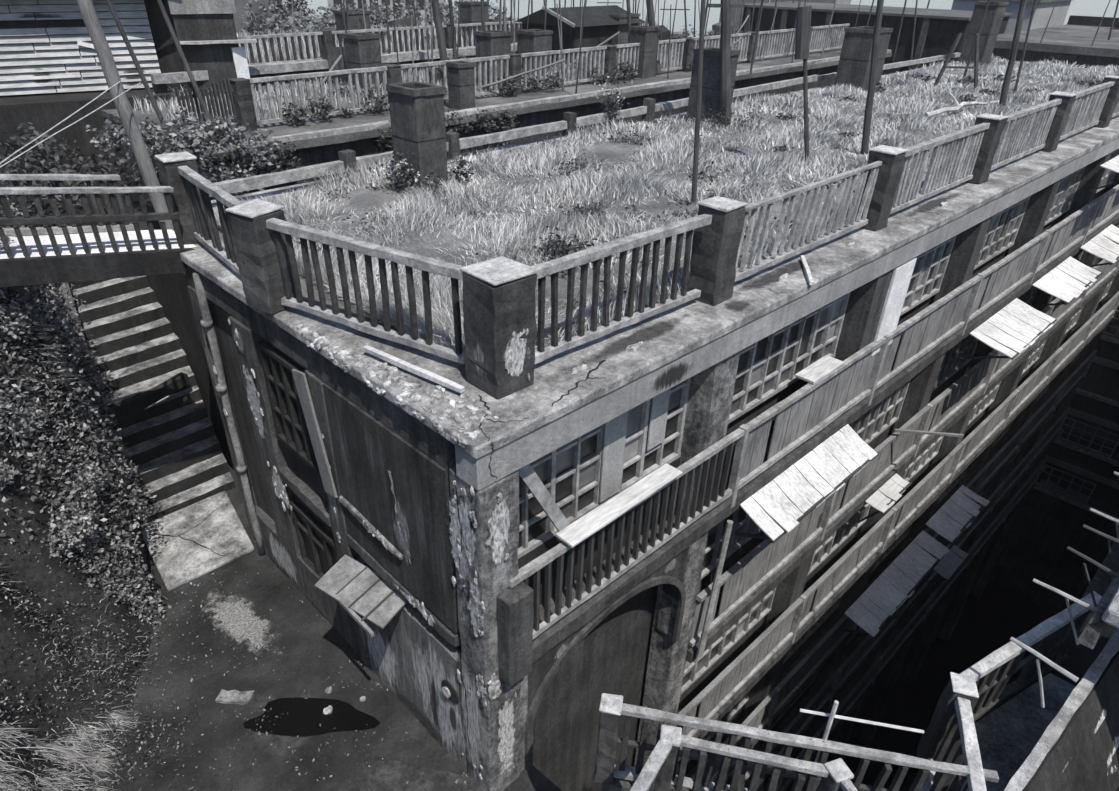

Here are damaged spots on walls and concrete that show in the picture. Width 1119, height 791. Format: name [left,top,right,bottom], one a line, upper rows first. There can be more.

peeling [228,319,267,438]
peeling [504,328,530,381]
crack [552,360,606,406]
crack [478,395,525,479]
peeling [267,461,292,512]
peeling [449,480,510,637]
peeling [476,673,517,775]